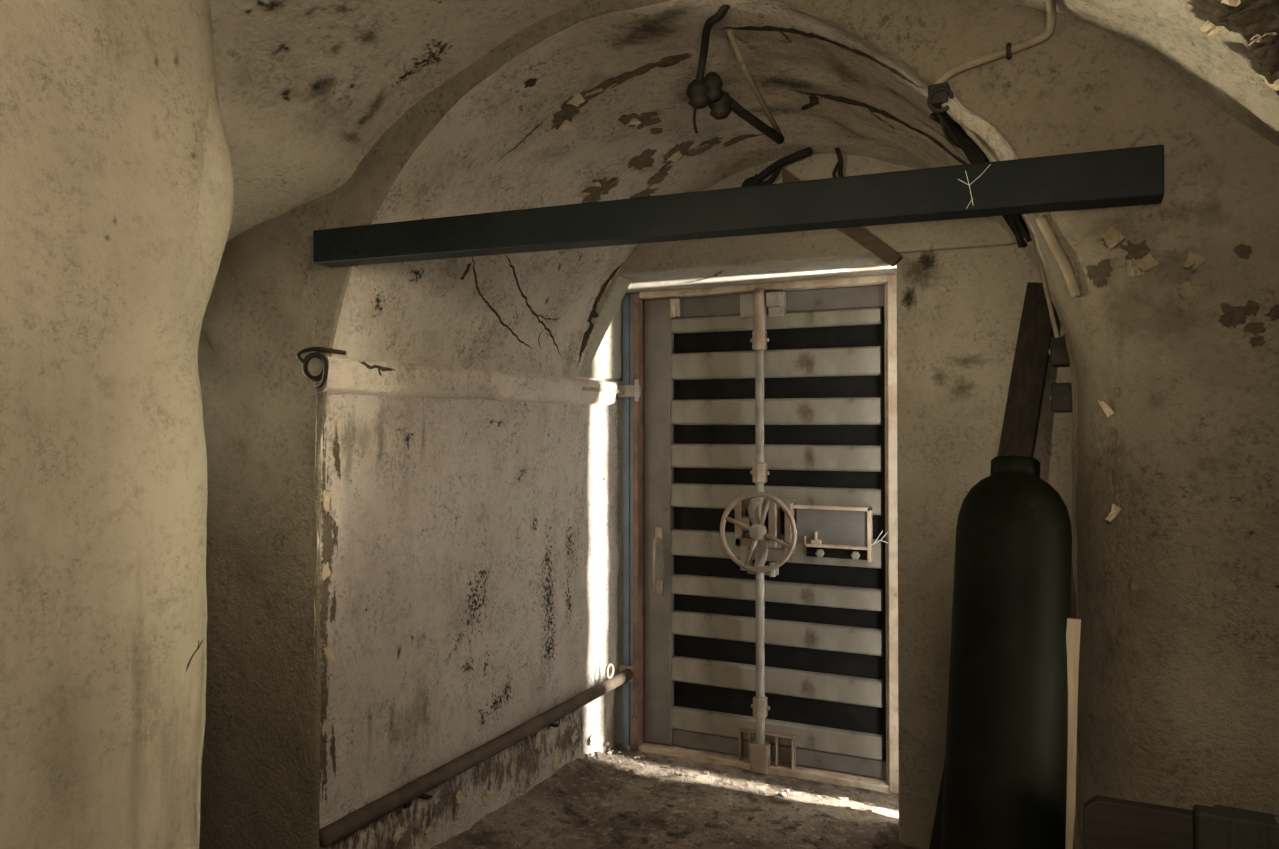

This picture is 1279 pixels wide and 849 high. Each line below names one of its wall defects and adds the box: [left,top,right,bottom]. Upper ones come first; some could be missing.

flaking render [1187,0,1279,95]
crack [460,254,563,360]
damp [448,570,491,680]
damp [532,508,573,682]
damp [477,675,512,732]